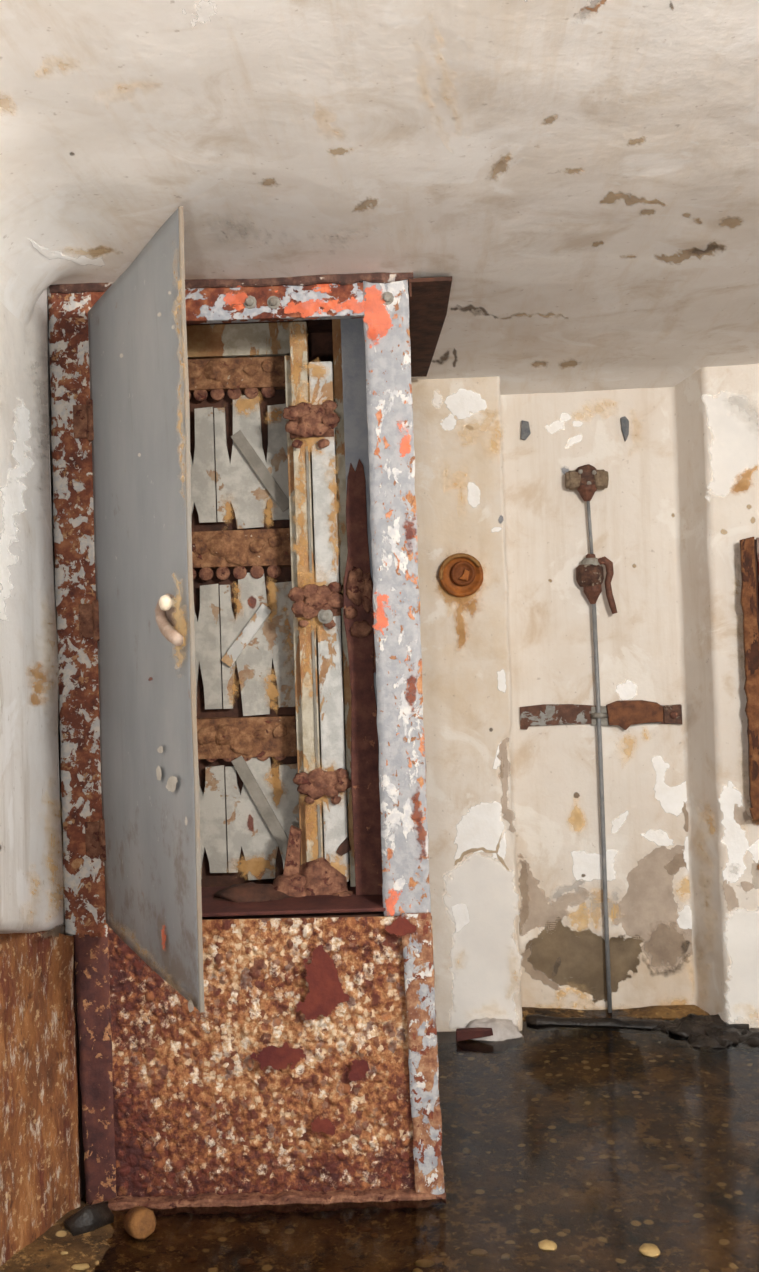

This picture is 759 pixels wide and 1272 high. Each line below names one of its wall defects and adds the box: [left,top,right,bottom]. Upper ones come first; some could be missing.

spalling [580,0,606,19]
crack [450,304,568,319]
peeling [702,391,759,501]
corrosion [436,567,484,649]
peeling [497,669,506,693]
crack [454,834,509,871]
spalling [454,728,693,1003]
peeling [718,781,759,1023]